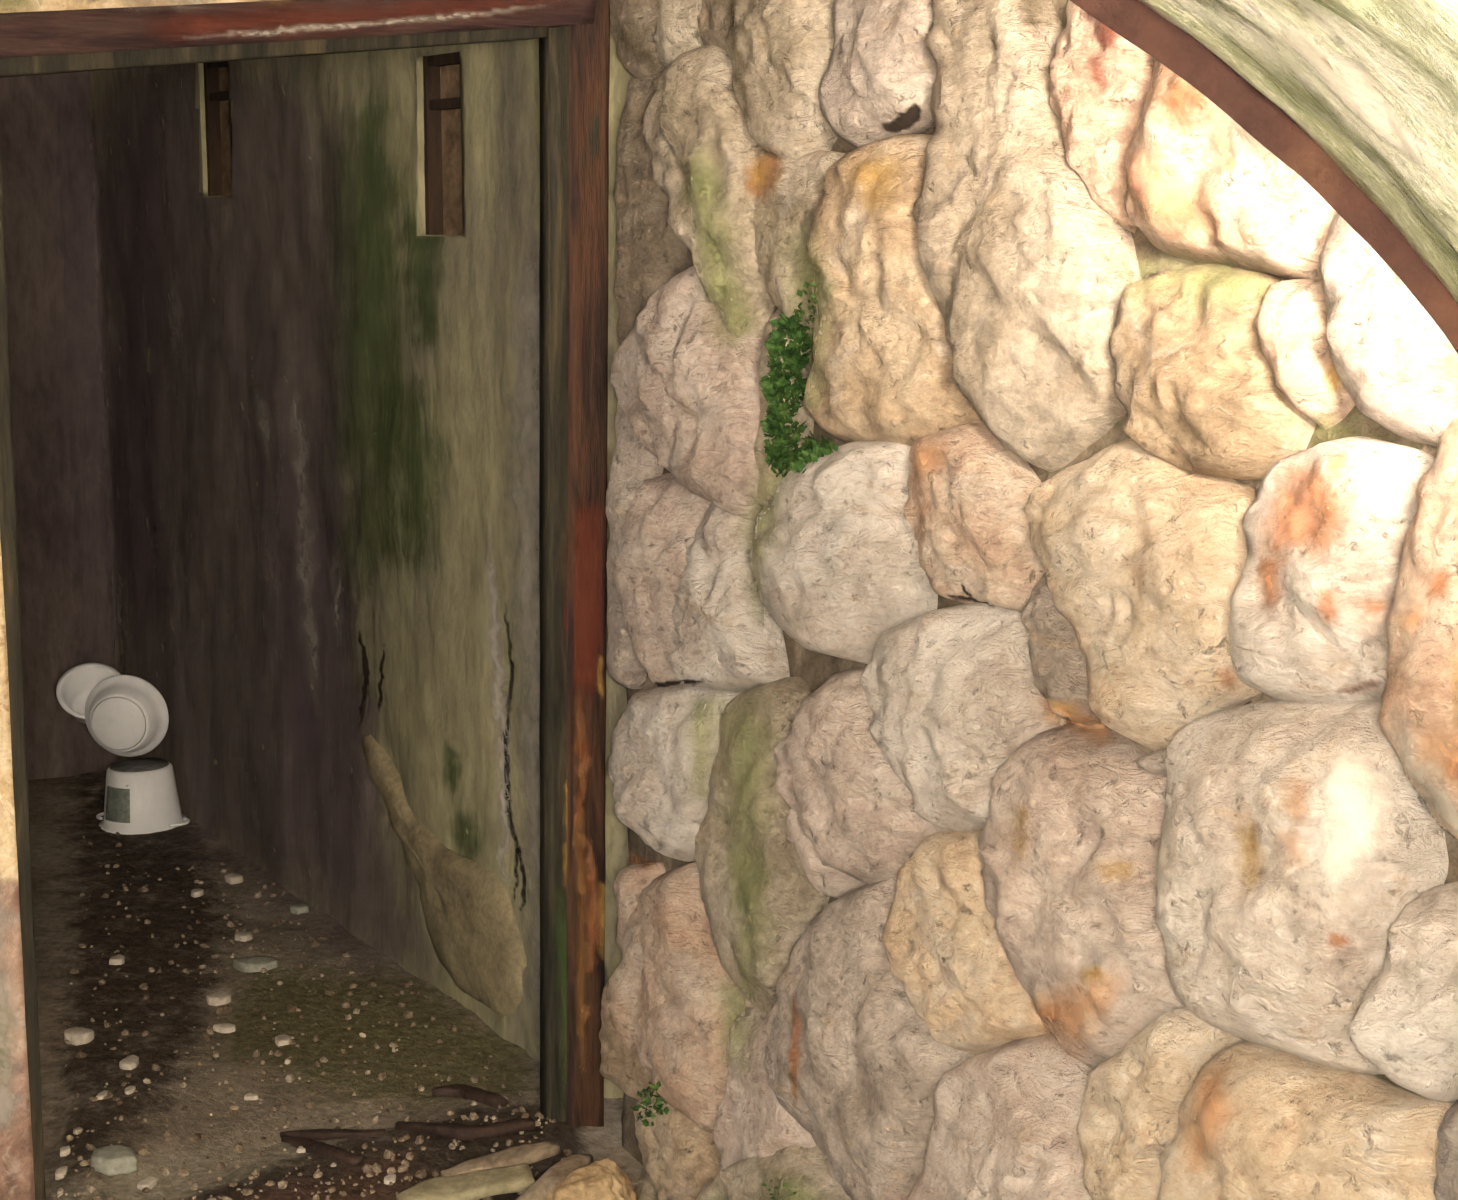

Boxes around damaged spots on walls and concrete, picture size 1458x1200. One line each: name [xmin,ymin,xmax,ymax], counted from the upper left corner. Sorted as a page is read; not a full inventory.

damp [77,62,438,950]
crack [359,634,385,724]
crack [502,620,526,911]
corrosion [573,511,603,692]